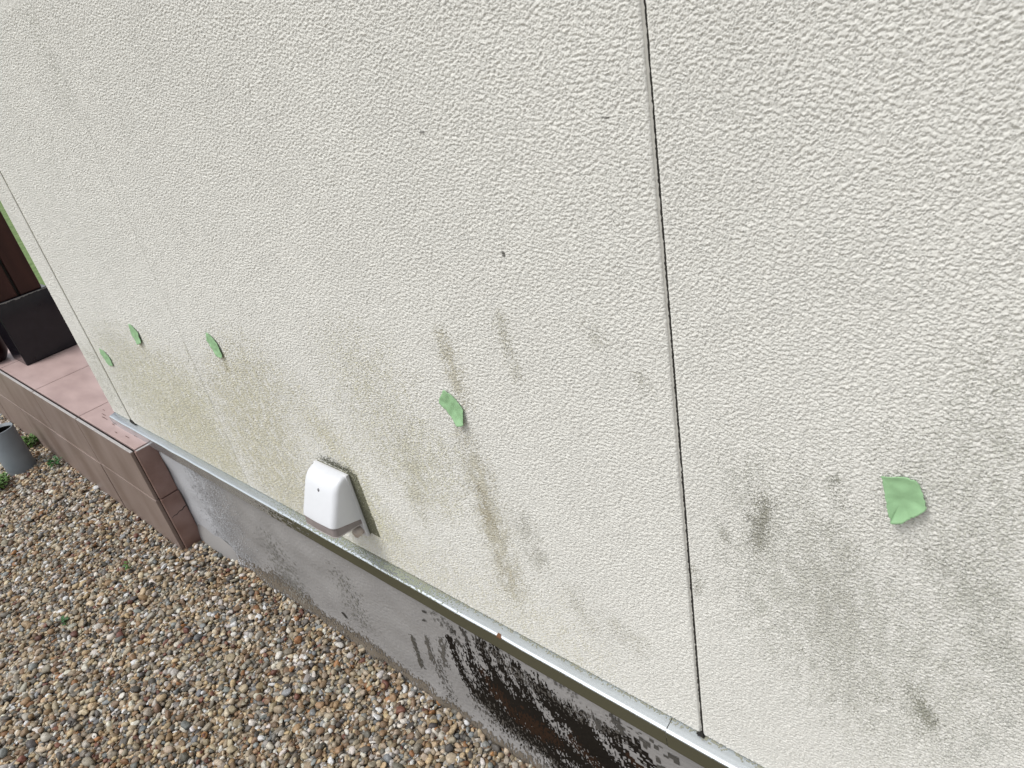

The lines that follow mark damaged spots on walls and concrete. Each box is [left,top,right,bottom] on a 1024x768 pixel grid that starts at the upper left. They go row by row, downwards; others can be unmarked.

mould [715,477,784,565]
leakage [408,611,679,768]
mould [875,677,947,749]